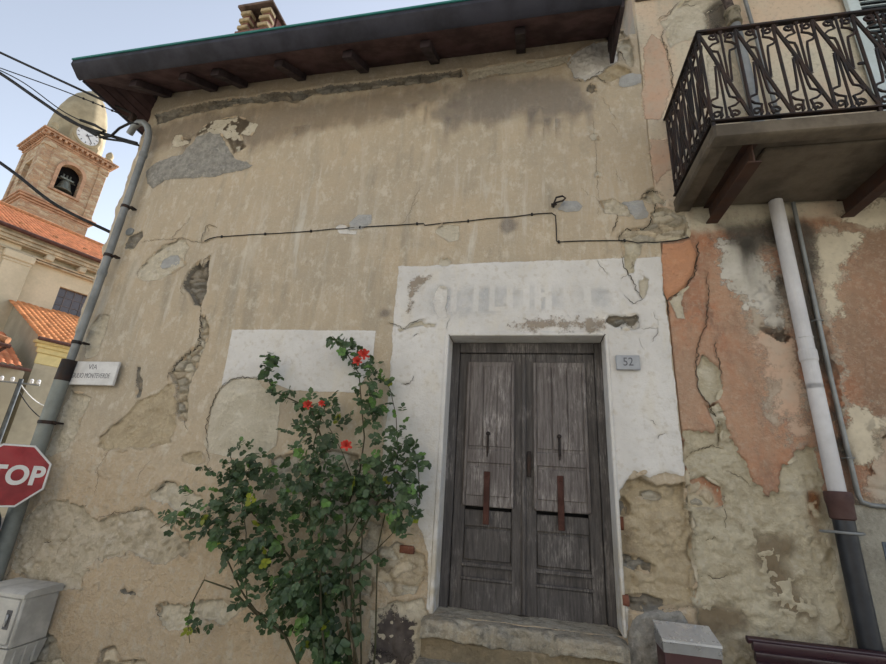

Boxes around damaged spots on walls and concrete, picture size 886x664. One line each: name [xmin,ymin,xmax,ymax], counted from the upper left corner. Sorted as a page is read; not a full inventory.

flaking render [155,0,723,152]
peeling [98,239,210,452]
flaking render [606,313,640,331]
crack [579,51,723,452]
peeling [618,139,696,319]
peeling [812,198,886,506]
peeling [619,238,852,664]
flaking render [93,646,149,664]
leakage [367,604,417,664]